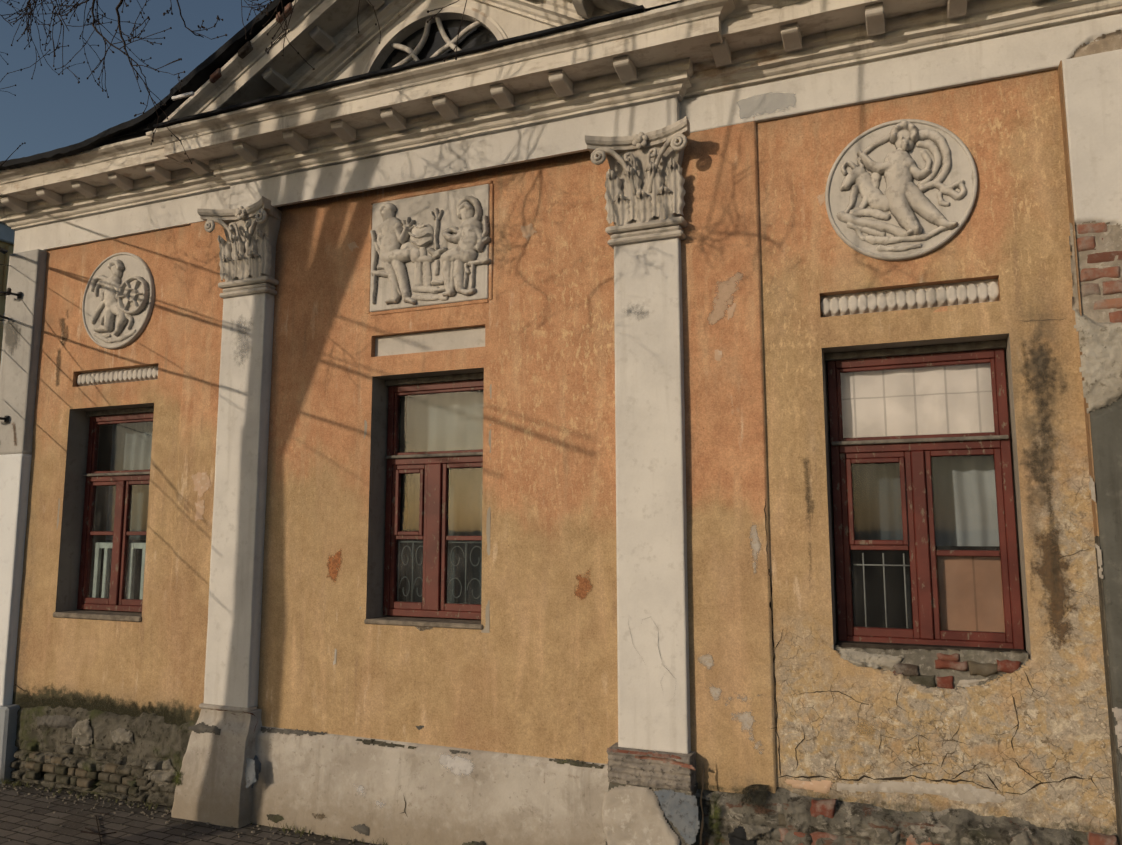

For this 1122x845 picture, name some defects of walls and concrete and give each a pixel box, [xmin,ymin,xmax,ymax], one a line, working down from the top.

spalling [1069,29,1122,59]
spalling [1069,221,1122,413]
peeling [327,550,341,581]
peeling [575,575,592,599]
spalling [835,645,1028,689]
crack [762,501,1122,795]
peeling [245,755,261,788]
spalling [728,779,1118,845]